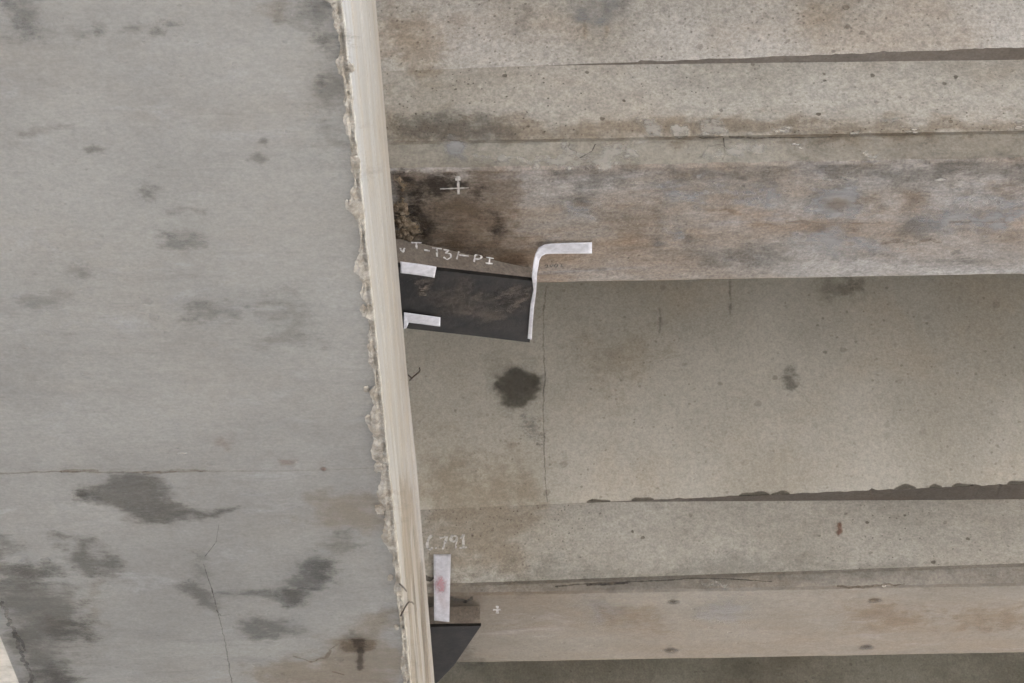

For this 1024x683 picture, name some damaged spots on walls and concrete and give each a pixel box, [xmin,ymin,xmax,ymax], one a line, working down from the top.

crack [0,601,34,682]